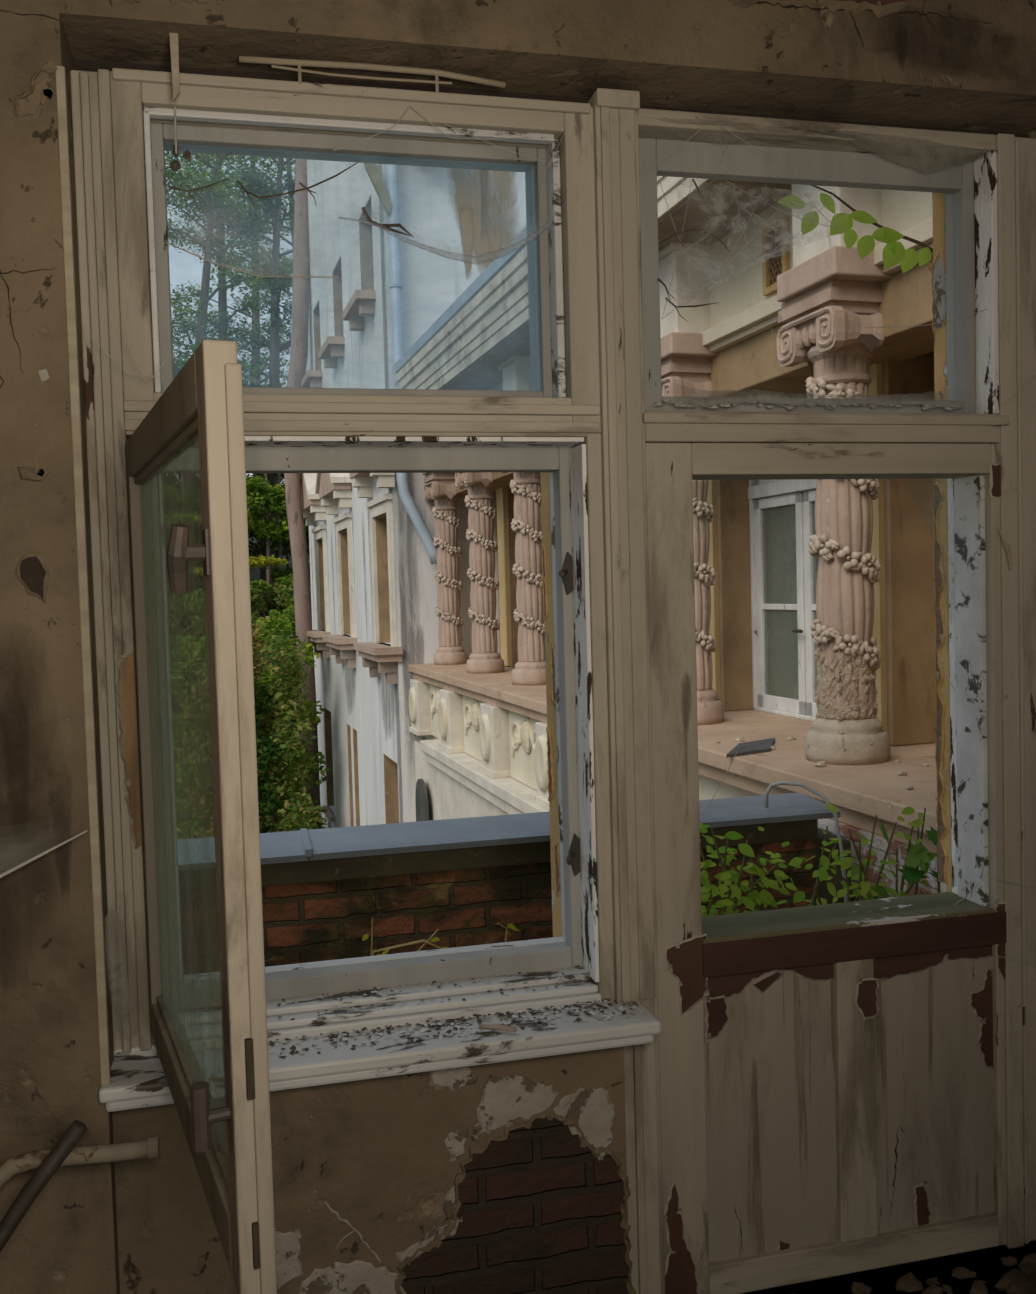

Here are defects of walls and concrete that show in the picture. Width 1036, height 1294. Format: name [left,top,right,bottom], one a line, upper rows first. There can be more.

crack [0,10,69,26]
crack [729,0,995,47]
crack [0,268,56,388]
peeling [244,436,644,1058]
peeling [665,934,834,1043]
peeling [855,943,1007,1069]
flaking render [275,1066,636,1294]
peeling [663,1183,700,1294]